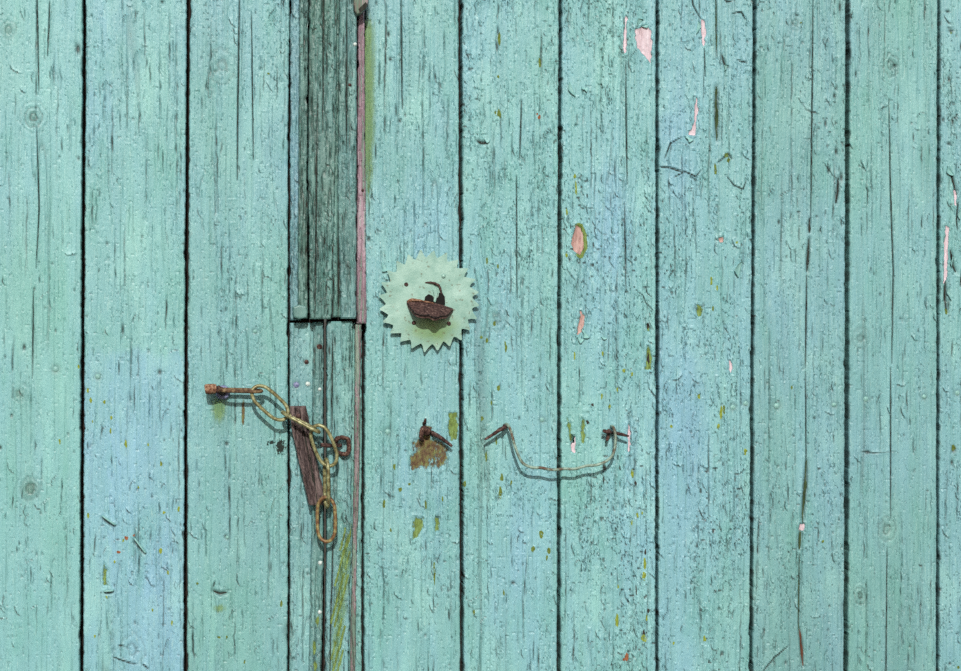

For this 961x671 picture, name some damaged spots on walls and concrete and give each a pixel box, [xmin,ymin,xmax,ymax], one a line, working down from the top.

peeling [623,16,652,63]
peeling [685,98,698,142]
peeling [565,223,587,258]
peeling [943,226,954,315]
peeling [574,311,590,360]
crack [765,6,813,669]
corrosion [410,425,448,470]